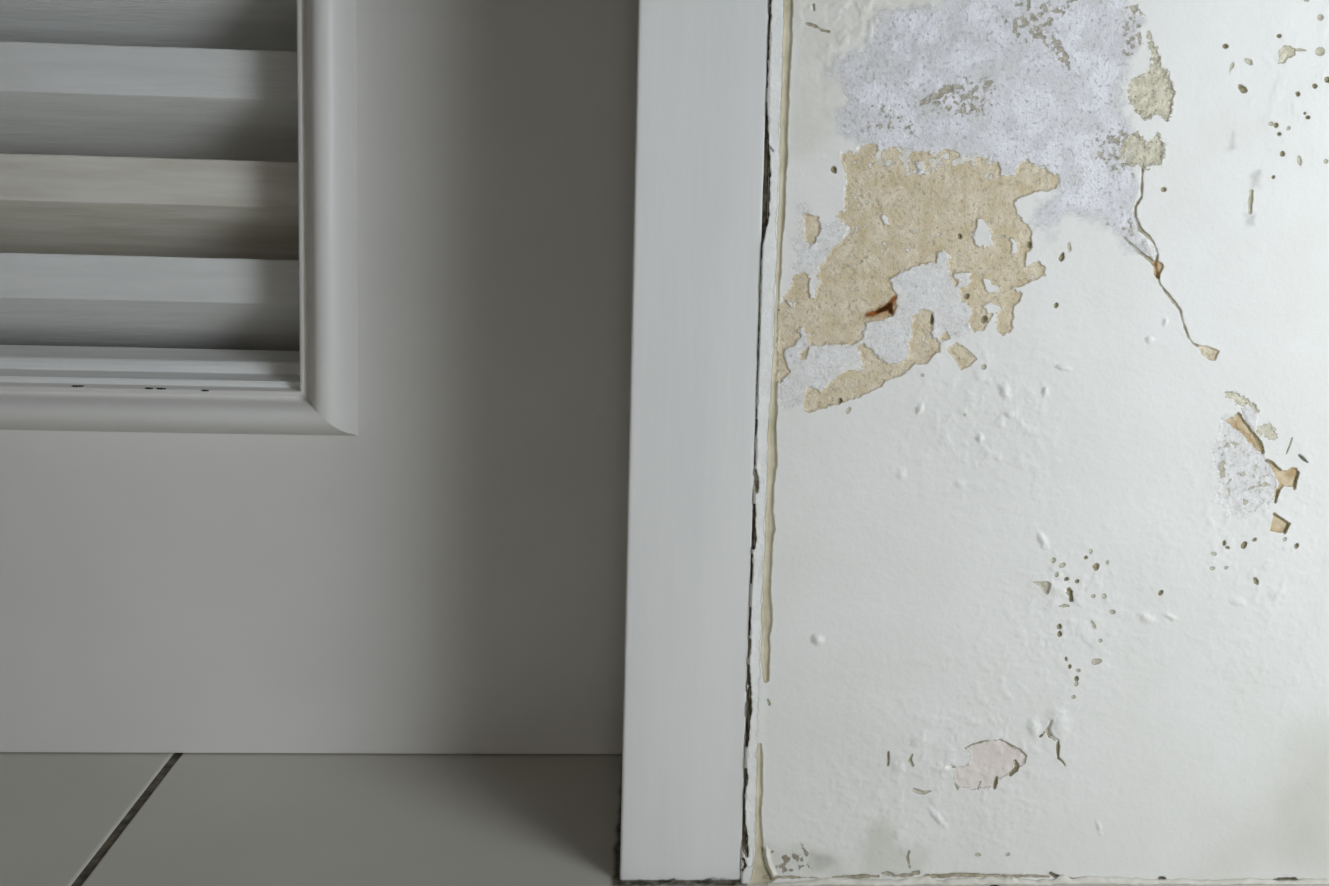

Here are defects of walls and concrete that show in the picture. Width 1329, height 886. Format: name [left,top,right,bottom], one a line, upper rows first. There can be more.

leakage [834,0,1145,251]
peeling [761,0,1071,683]
crack [1123,168,1220,360]
flaking render [1212,391,1300,549]
peeling [750,743,778,884]
peeling [952,739,1027,790]